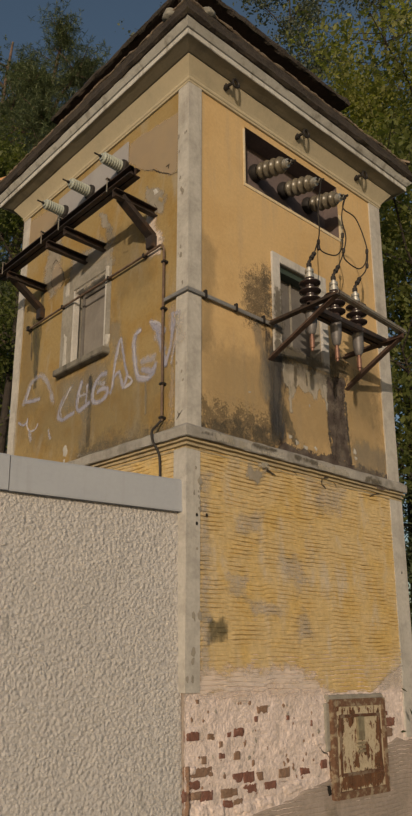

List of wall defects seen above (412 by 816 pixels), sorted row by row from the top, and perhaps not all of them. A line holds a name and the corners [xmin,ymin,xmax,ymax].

damp [254,322,352,466]
peeling [283,360,328,413]
peeling [192,611,227,643]
spalling [181,654,412,816]